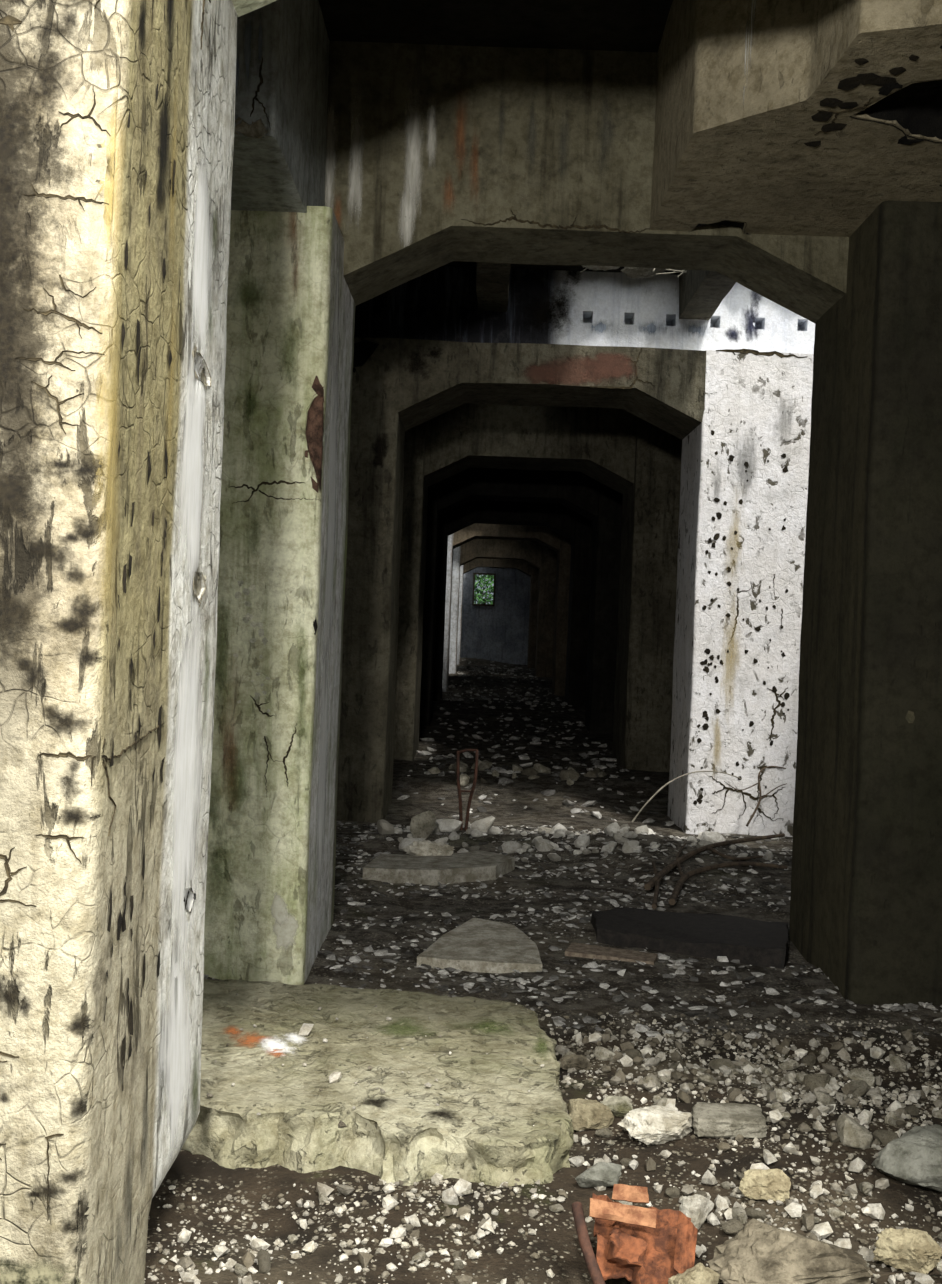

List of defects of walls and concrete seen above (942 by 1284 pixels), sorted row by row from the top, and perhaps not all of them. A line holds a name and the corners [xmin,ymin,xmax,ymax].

crack [59,87,111,136]
spalling [804,55,942,147]
crack [22,183,108,210]
water stain [0,101,33,404]
crack [15,275,105,434]
water stain [50,367,117,571]
water stain [31,519,98,581]
water stain [0,588,46,693]
water stain [59,596,96,632]
crack [709,688,788,821]
crack [0,723,164,907]
crack [45,1134,64,1221]